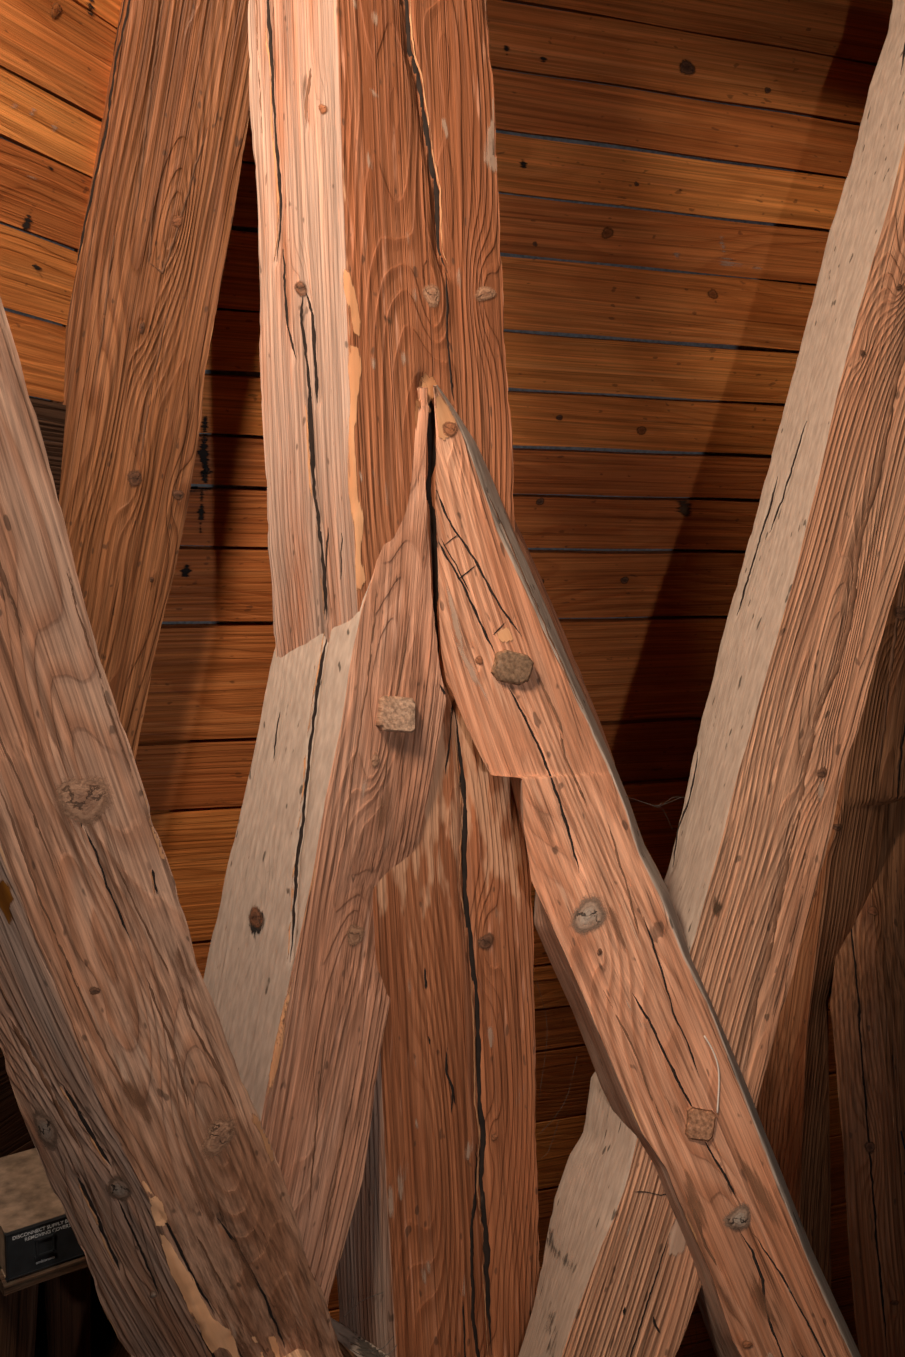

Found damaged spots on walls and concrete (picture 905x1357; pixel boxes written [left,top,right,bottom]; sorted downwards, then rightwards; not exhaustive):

crack [255,0,343,958]
crack [344,0,699,1357]
crack [308,1035,355,1242]
peeling [142,1181,239,1357]
peeling [252,1336,280,1357]